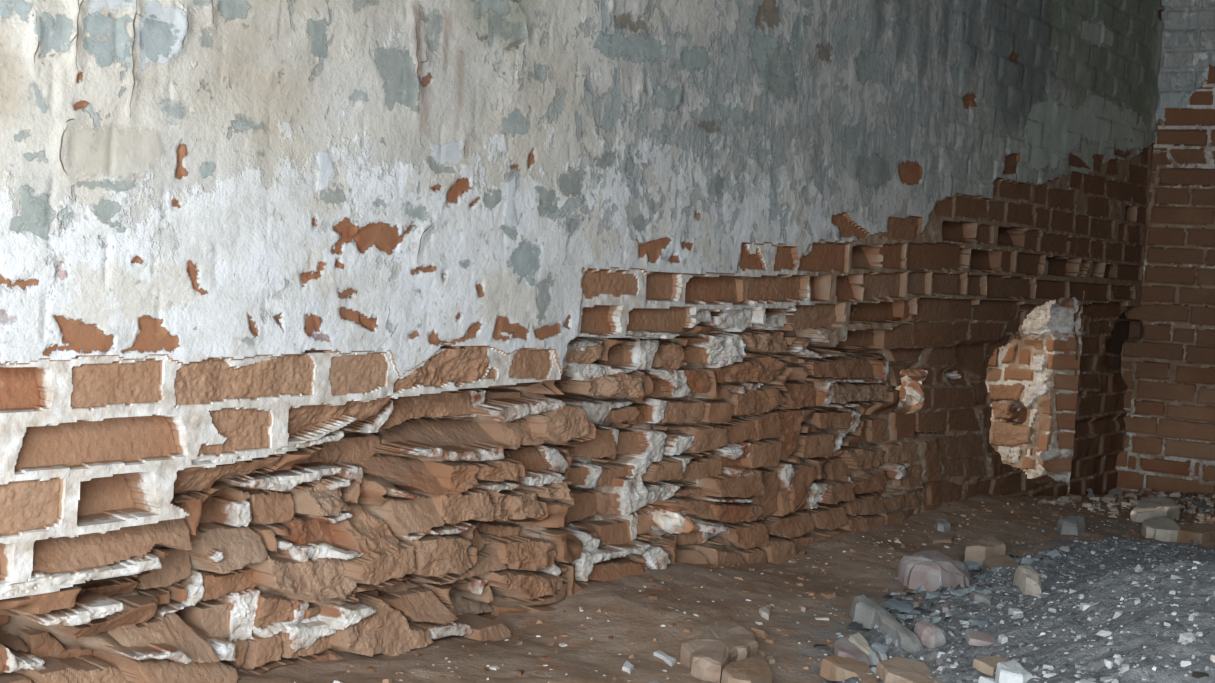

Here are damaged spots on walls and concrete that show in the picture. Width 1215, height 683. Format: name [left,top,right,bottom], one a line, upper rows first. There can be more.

peeling [0,0,251,71]
peeling [306,18,328,58]
peeling [374,47,432,111]
peeling [14,131,47,163]
peeling [10,186,55,240]
peeling [77,173,135,232]
flaking render [175,144,215,180]
peeling [316,151,345,204]
flaking render [301,201,426,287]
peeling [427,139,502,210]
spalling [535,64,1215,592]
spalling [0,313,596,683]